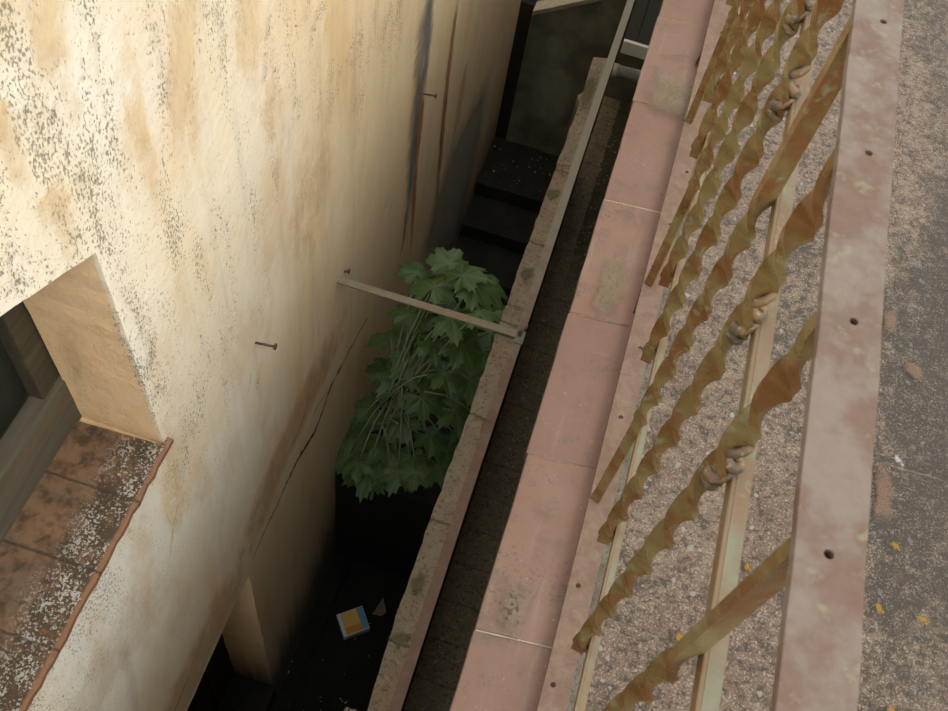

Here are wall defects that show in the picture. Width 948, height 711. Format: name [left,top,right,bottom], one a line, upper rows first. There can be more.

leakage [23,93,62,149]
leakage [129,101,150,145]
rust [411,79,423,228]
rust [436,14,457,198]
leakage [0,238,52,300]
leakage [102,254,170,414]
crack [252,318,368,560]